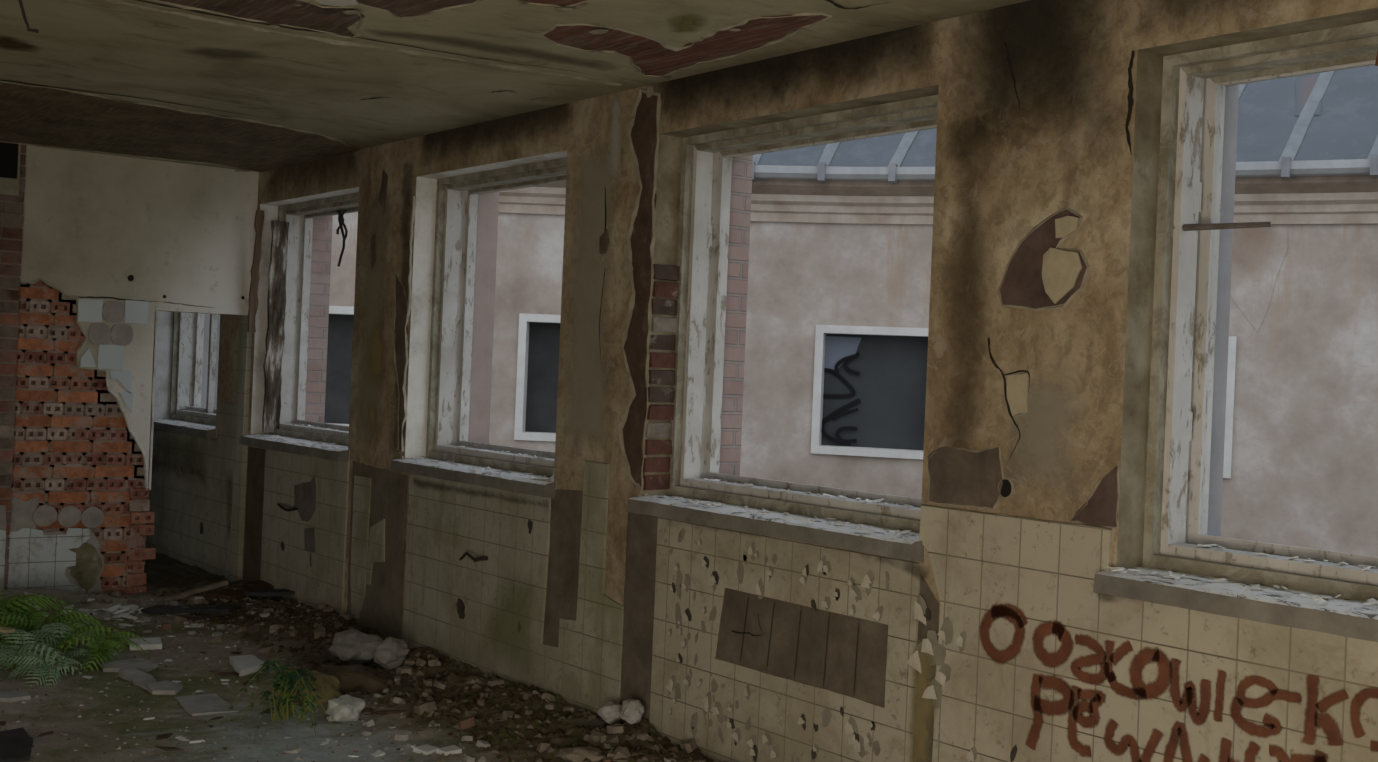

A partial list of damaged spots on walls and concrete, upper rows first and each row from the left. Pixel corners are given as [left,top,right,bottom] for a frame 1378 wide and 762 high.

spalling [0,81,363,173]
spalling [154,0,482,38]
crack [1125,51,1135,155]
flaking render [517,0,916,539]
flaking render [998,207,1090,311]
flaking render [10,277,148,594]
peeling [243,424,349,583]
peeling [346,461,408,640]
peeling [394,196,583,647]
peeling [619,512,890,762]
peeling [907,573,966,762]
crack [988,337,1030,461]